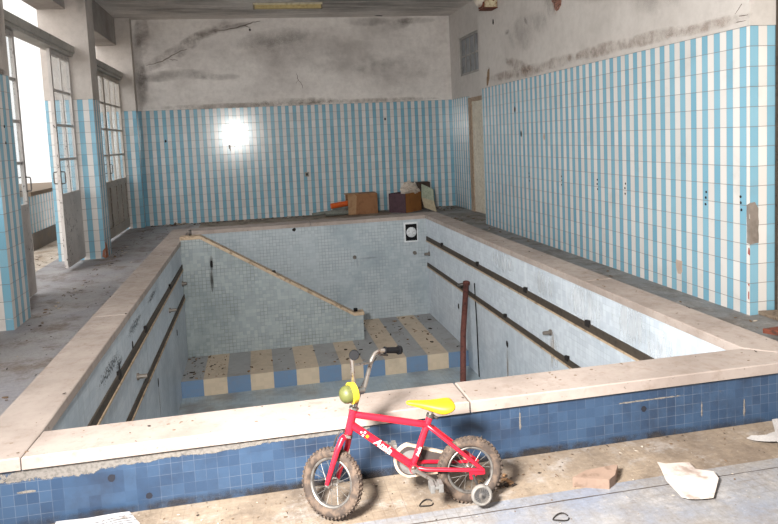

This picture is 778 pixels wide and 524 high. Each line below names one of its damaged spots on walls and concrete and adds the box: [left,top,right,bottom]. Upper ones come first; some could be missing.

peeling [747,202,759,255]
peeling [0,429,343,494]